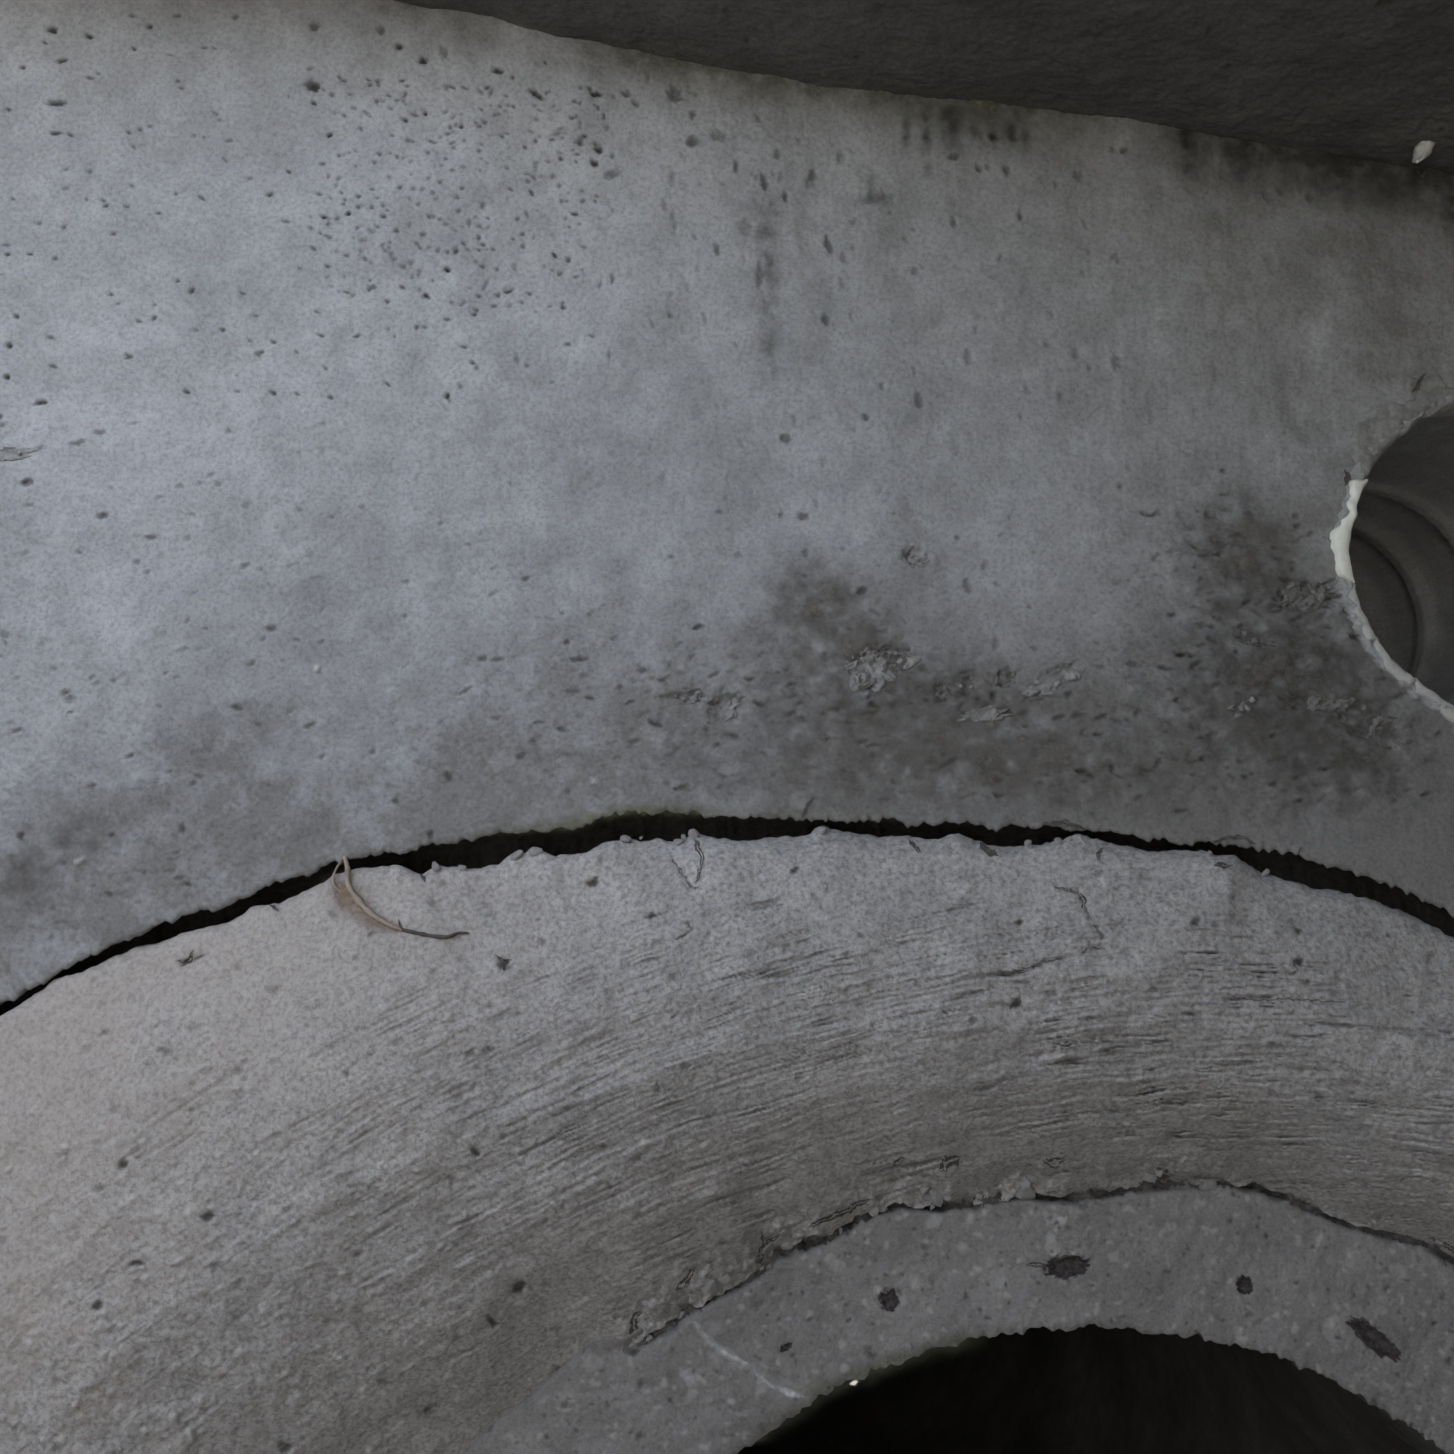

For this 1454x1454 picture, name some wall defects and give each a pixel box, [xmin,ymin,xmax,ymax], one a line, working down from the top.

leakage [788,581,876,721]
leakage [875,651,1111,803]
leakage [1208,626,1396,792]
crack [0,796,1454,1016]
crack [629,1155,1454,1348]